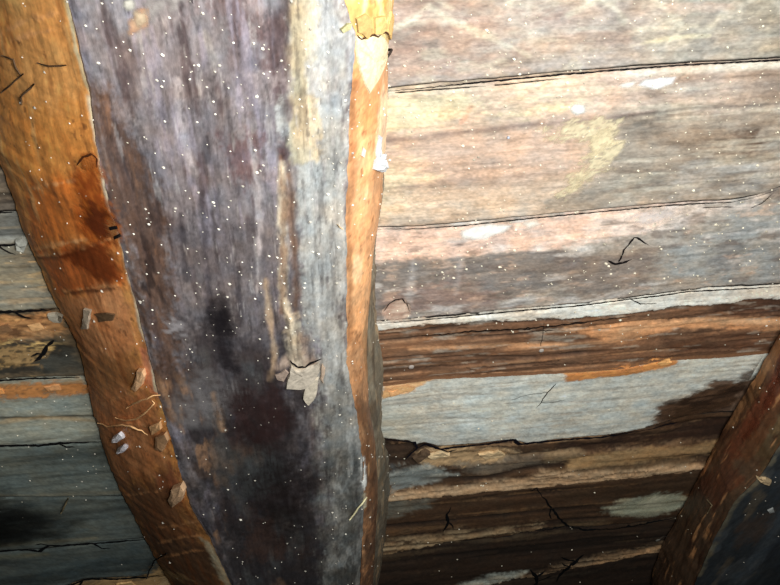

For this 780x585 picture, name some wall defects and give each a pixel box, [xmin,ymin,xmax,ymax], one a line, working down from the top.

damp [212,298,237,371]
damp [658,365,759,426]